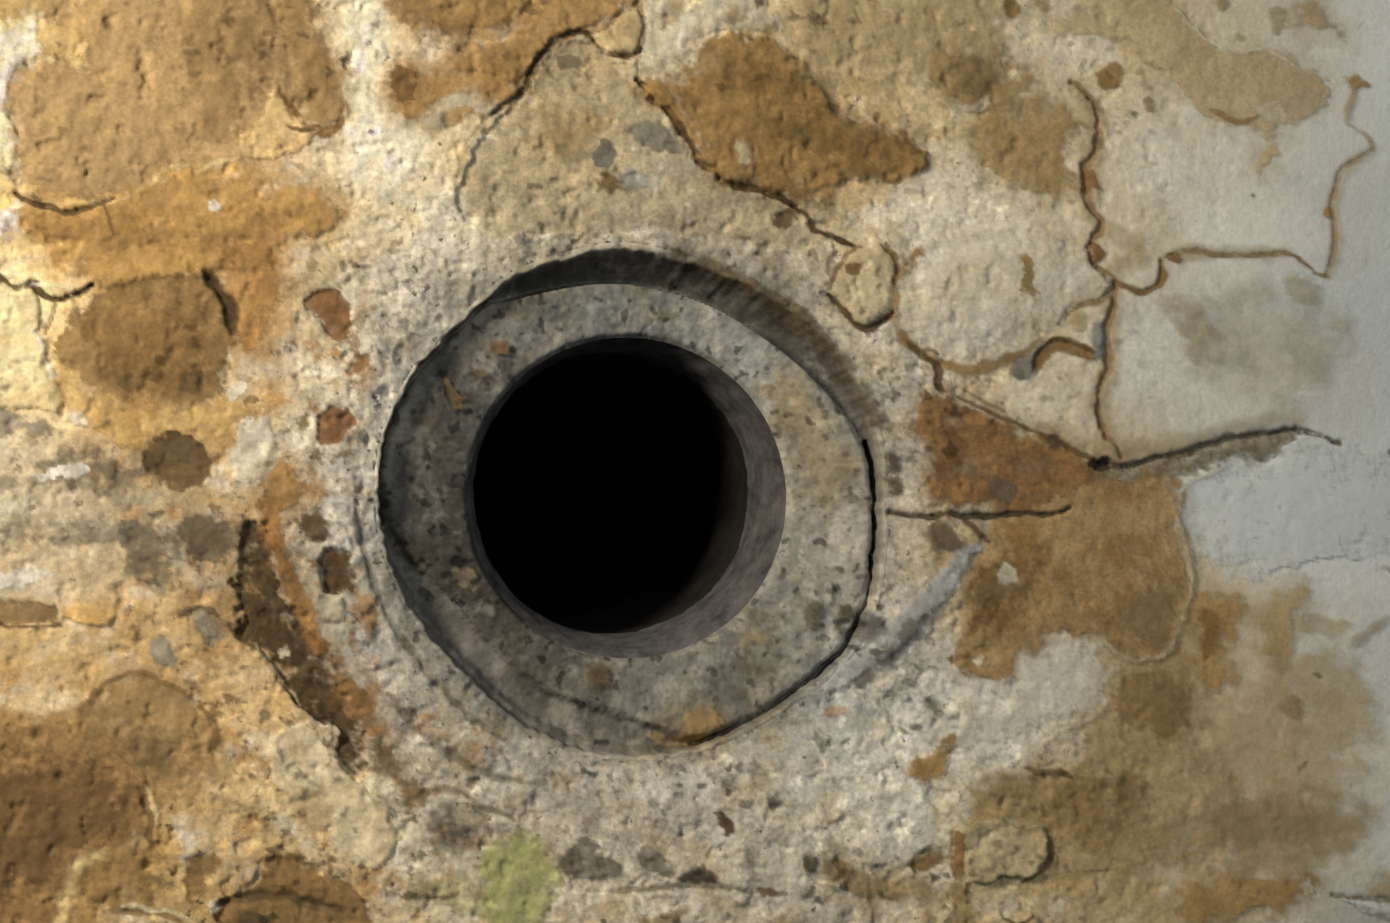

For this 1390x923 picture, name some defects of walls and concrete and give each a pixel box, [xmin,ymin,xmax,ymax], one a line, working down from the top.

damp [0,0,350,236]
crack [463,0,856,247]
damp [637,0,1329,174]
crack [908,76,1373,483]
damp [0,669,223,923]
damp [825,543,982,692]
crack [888,507,1070,551]
damp [966,774,1049,827]
damp [918,640,1120,760]
damp [1197,652,1372,872]